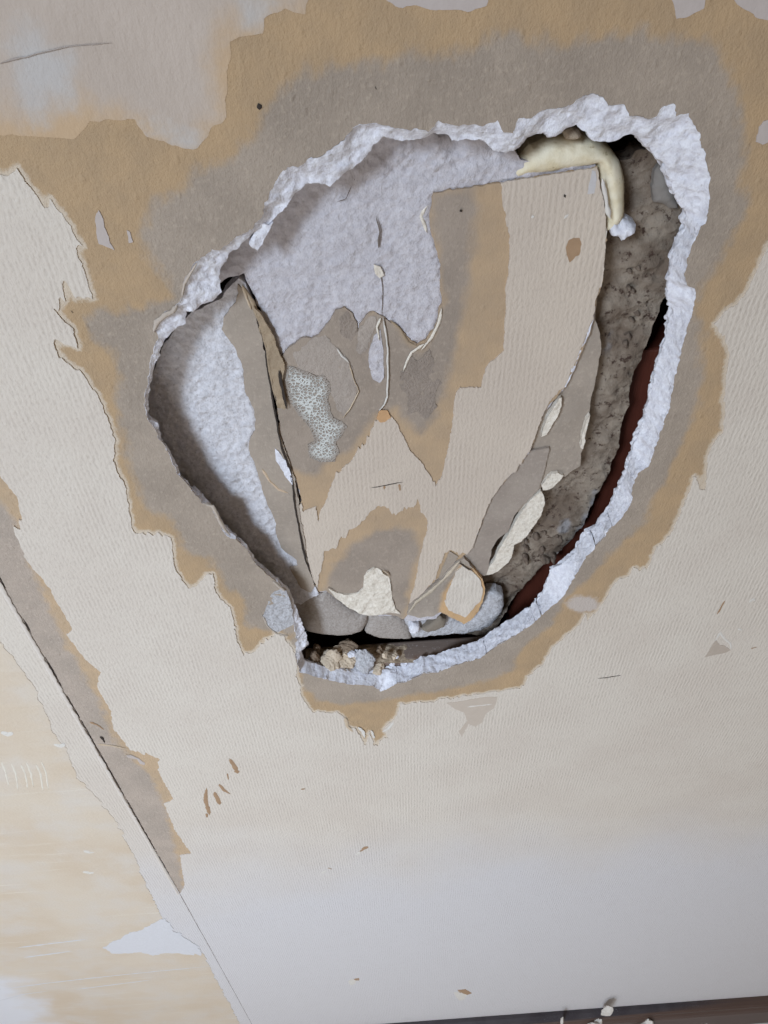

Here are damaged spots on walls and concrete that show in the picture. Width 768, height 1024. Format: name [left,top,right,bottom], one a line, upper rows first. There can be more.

peeling [0,0,768,745]
peeling [0,476,191,893]
crack [0,578,252,1024]
spalling [203,758,240,817]